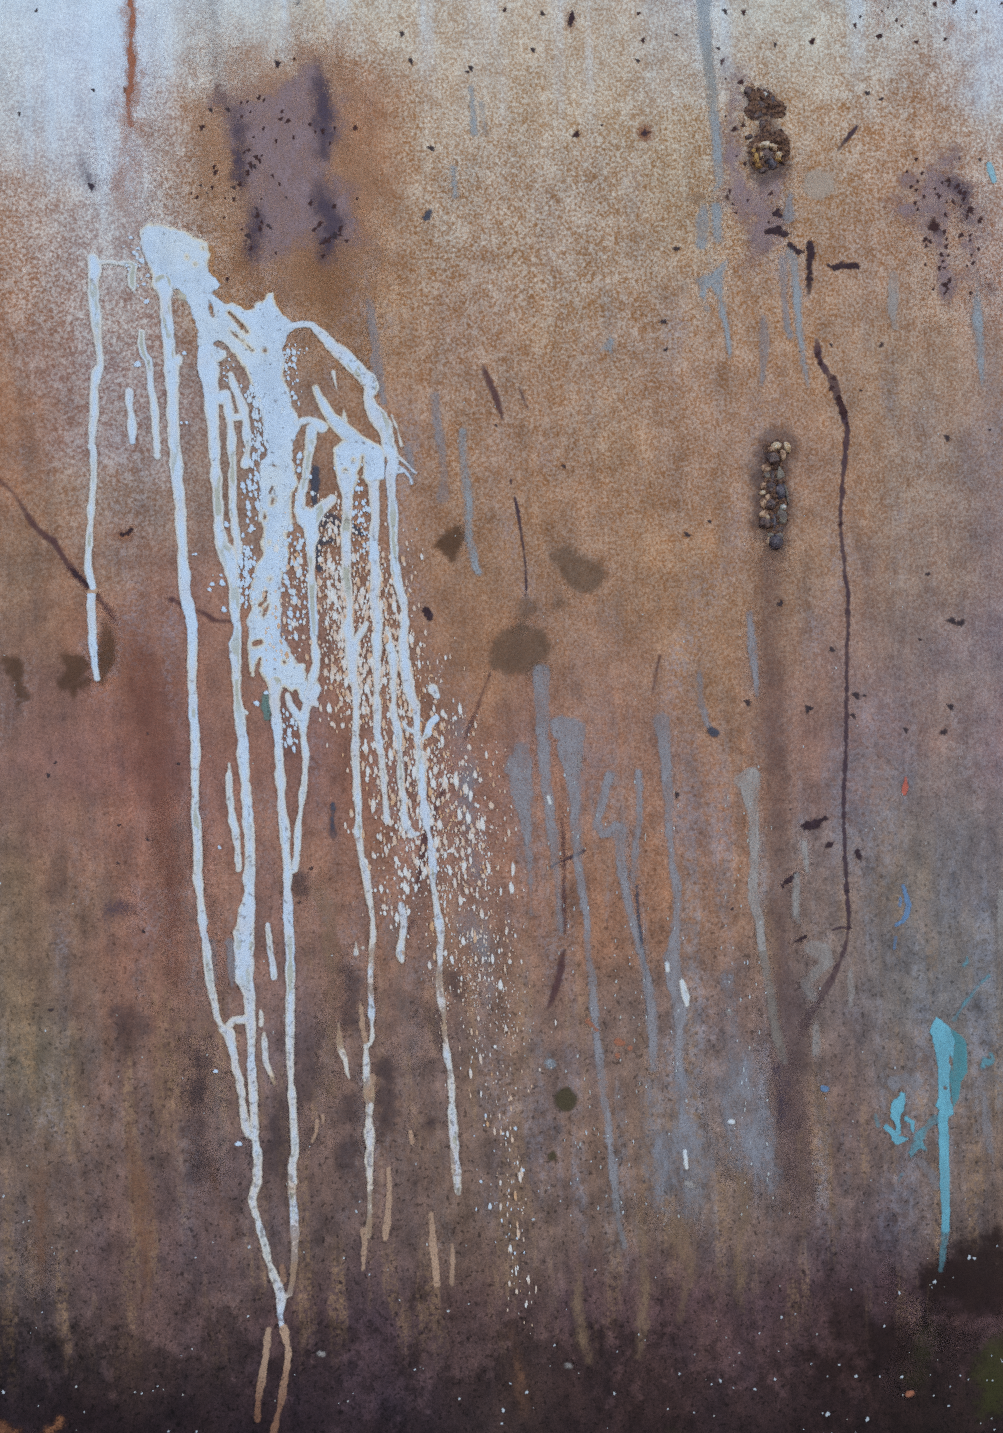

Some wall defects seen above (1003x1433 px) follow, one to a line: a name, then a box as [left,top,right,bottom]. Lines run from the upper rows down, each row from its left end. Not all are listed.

rust [123,0,136,127]
rust [190,48,377,294]
rust [639,125,651,141]
rust [716,47,789,249]
rust [898,154,982,295]
rust [118,528,133,541]
damp [922,1231,1003,1315]